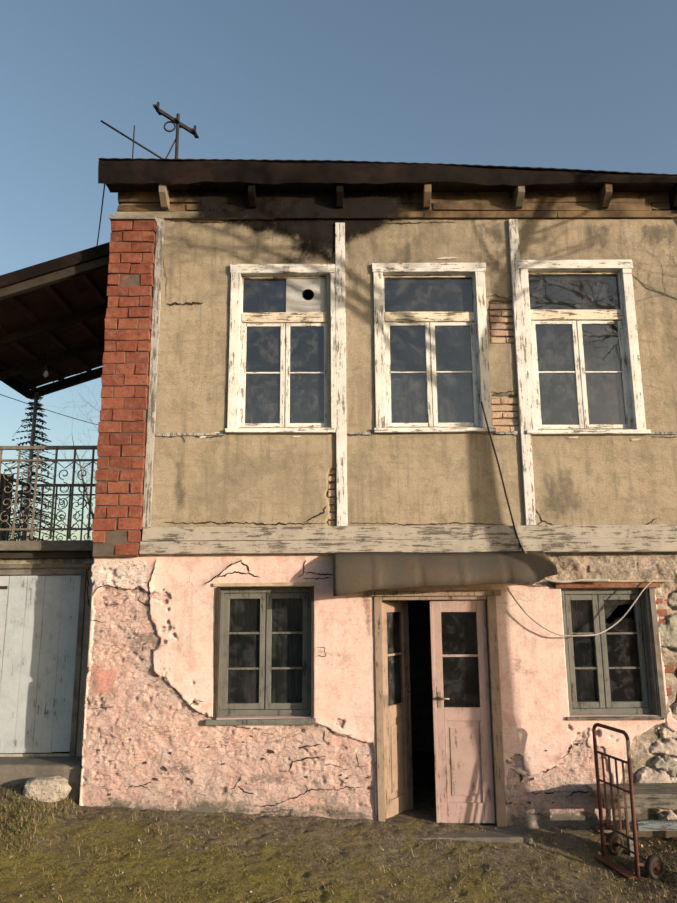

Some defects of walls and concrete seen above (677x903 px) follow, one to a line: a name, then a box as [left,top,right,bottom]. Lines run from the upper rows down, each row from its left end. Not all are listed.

spalling [487,301,514,344]
spalling [491,395,519,434]
spalling [326,470,337,526]
crack [205,560,261,584]
crack [298,561,333,580]
peeling [81,561,377,820]
spalling [505,552,677,829]
crack [224,723,365,815]